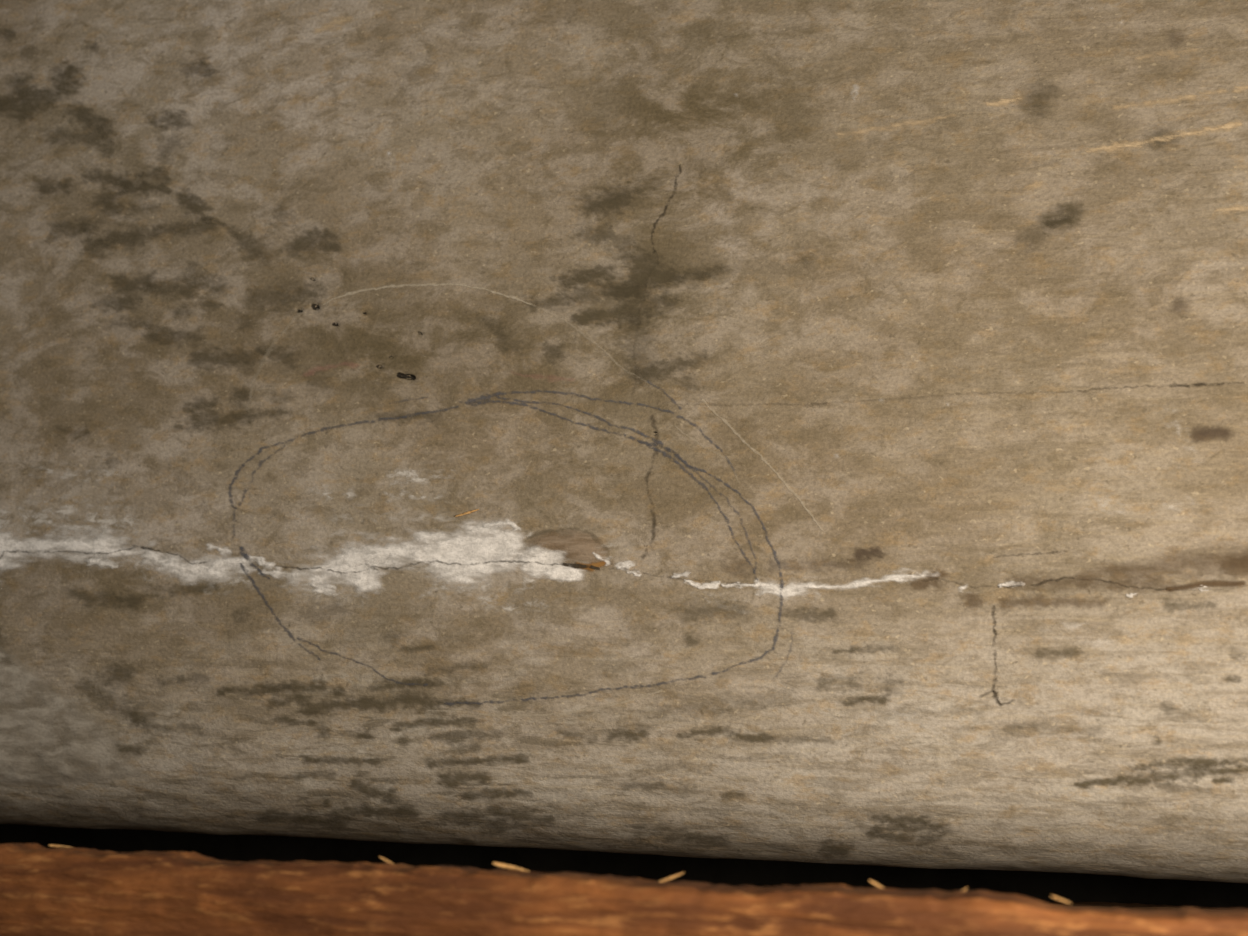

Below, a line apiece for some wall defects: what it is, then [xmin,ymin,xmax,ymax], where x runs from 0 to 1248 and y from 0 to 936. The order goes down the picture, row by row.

water stain [85,169,213,229]
water stain [560,256,704,324]
water stain [0,506,583,600]
water stain [593,553,641,576]
water stain [672,572,939,597]
water stain [250,679,464,734]
water stain [678,729,769,741]
water stain [301,781,418,826]
water stain [429,757,554,831]
water stain [1075,759,1248,788]